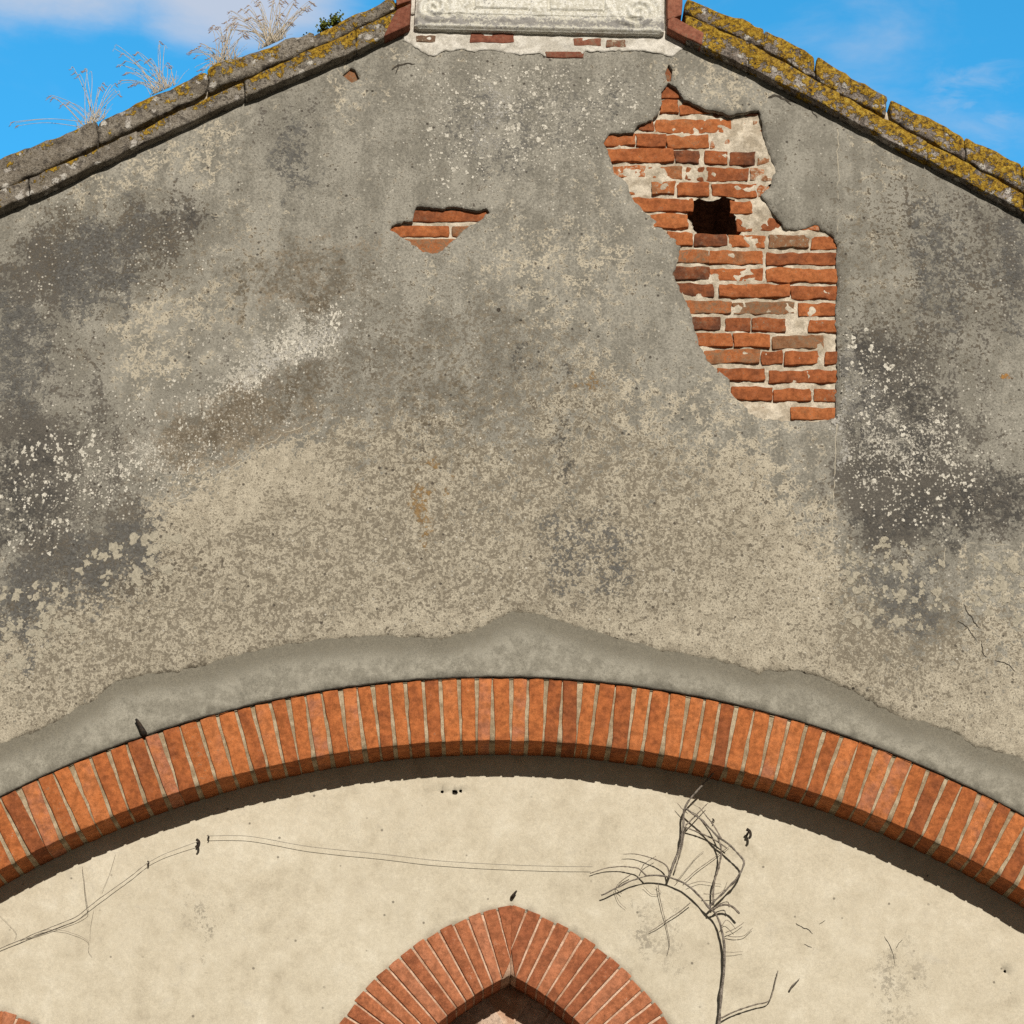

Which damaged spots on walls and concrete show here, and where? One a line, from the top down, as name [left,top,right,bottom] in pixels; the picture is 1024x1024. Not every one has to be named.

leakage [0,192,217,677]
spalling [390,38,1003,640]
leakage [832,327,951,477]
leakage [907,199,1024,338]
leakage [840,463,1024,636]